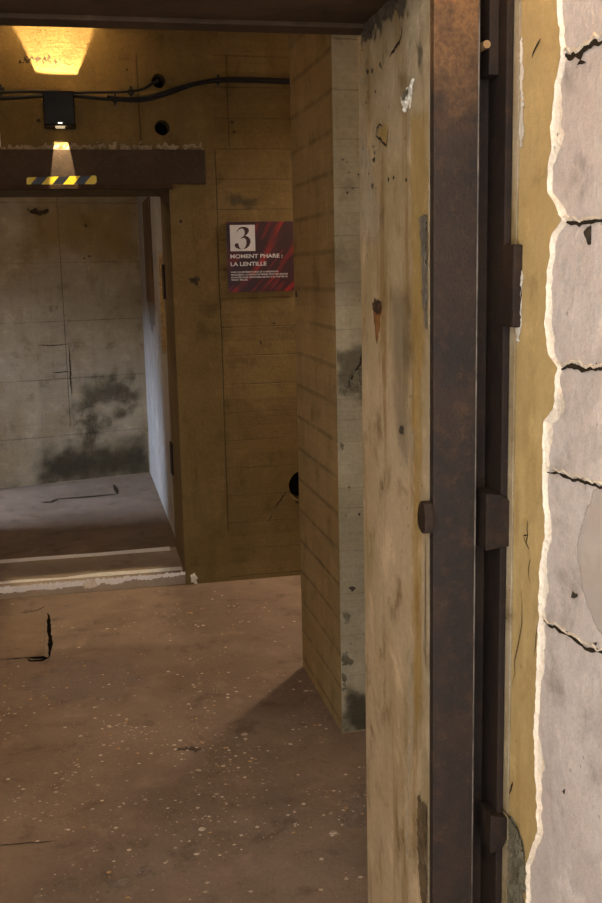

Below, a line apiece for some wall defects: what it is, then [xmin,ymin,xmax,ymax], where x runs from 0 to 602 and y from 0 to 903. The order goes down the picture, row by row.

spalling [583,225,592,245]
damp [337,347,362,397]
damp [40,375,149,483]
flaking render [502,0,570,903]
damp [347,692,366,730]